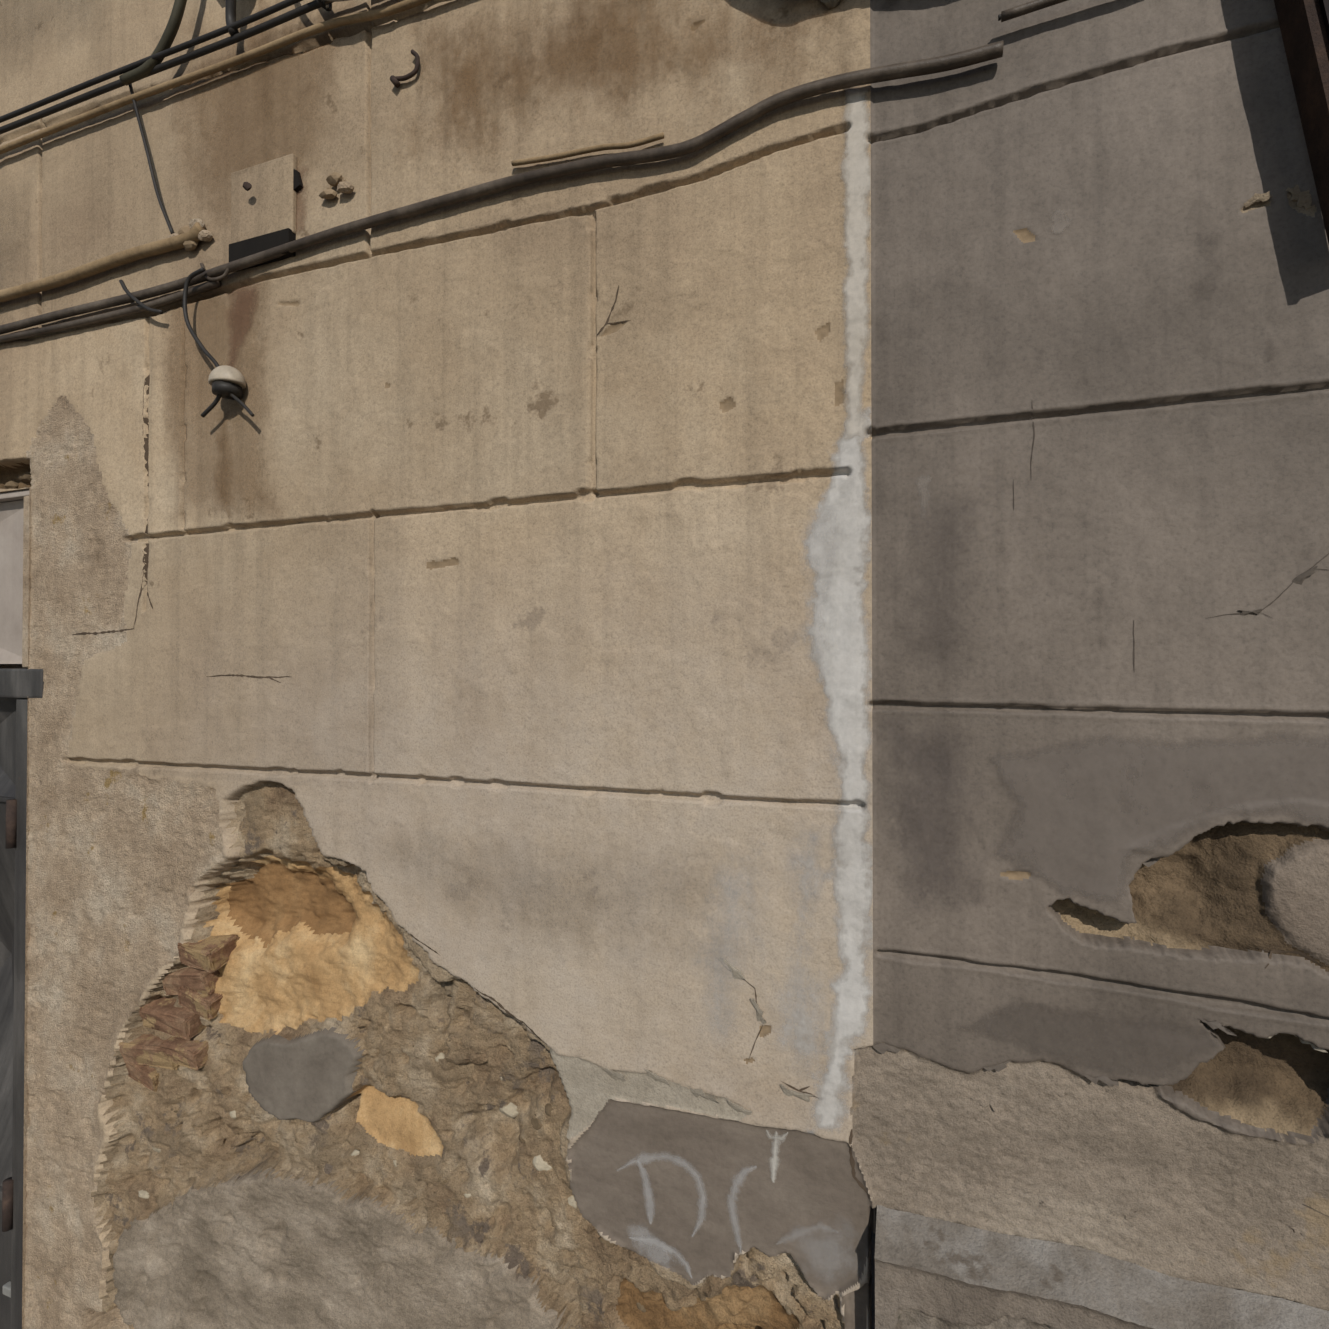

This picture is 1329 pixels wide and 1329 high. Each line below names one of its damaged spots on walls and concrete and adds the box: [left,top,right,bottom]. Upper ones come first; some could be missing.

crack [1209,553,1329,618]
spalling [0,395,845,1329]
spalling [1051,822,1329,972]
crack [717,957,766,1058]
crack [781,1081,819,1099]
peeling [850,1017,1329,1311]